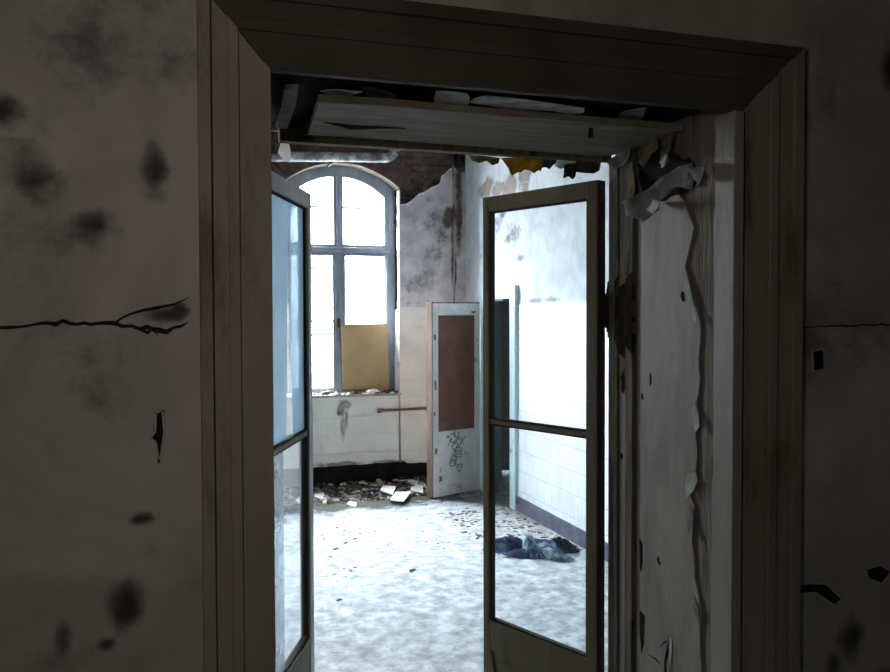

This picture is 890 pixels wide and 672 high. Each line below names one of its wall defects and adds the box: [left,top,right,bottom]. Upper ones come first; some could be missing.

peeling [321,87,396,99]
peeling [434,90,584,114]
water stain [479,169,531,197]
peeling [271,121,706,309]
crack [649,634,672,672]